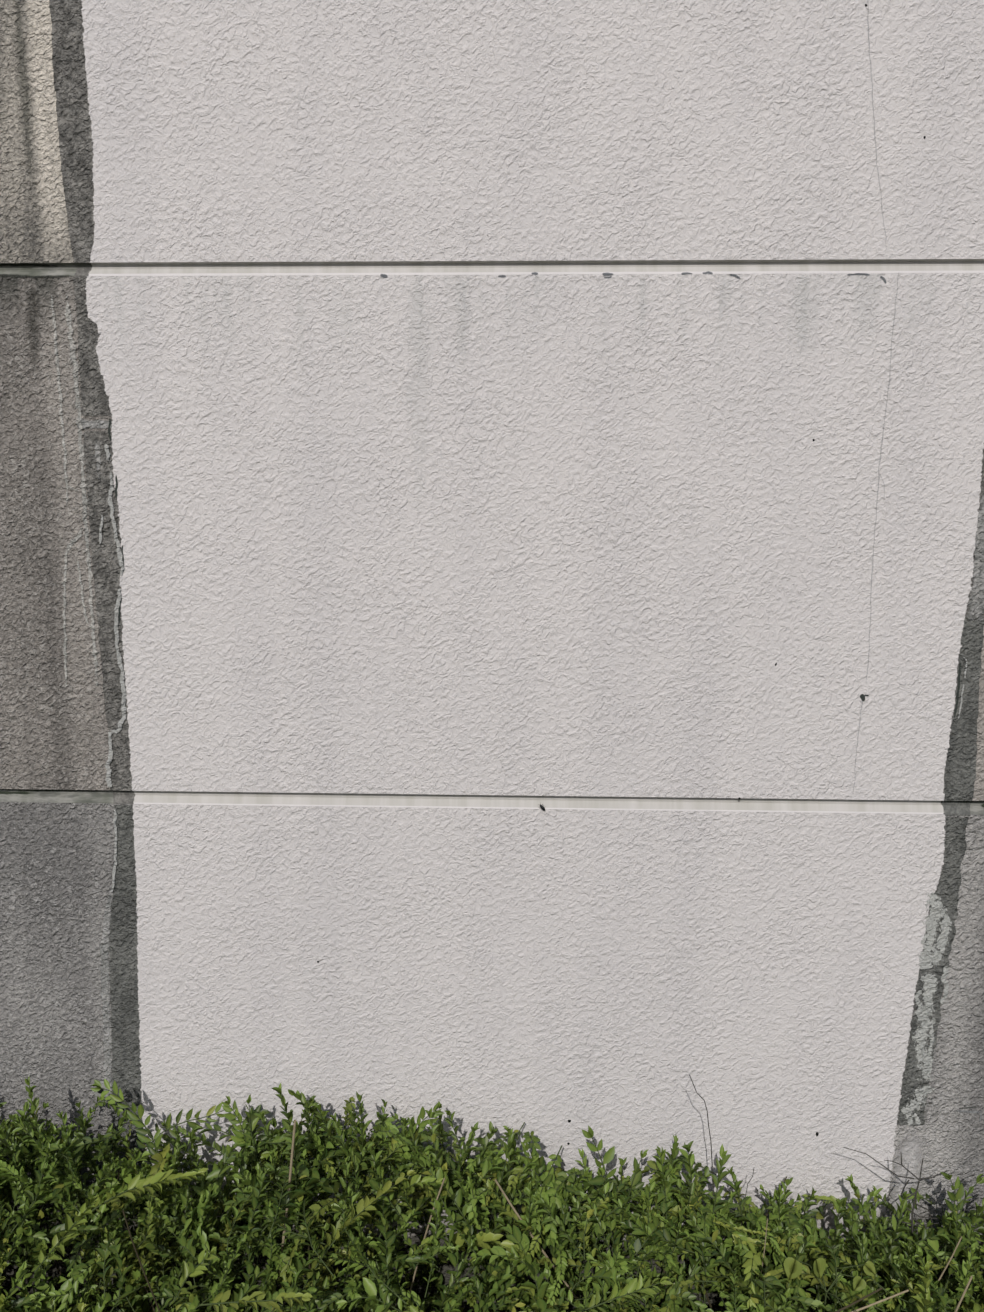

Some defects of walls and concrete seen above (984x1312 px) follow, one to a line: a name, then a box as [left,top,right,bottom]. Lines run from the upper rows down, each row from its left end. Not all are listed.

leakage [0,0,144,1174]
leakage [941,449,984,816]
peeling [897,817,969,1126]